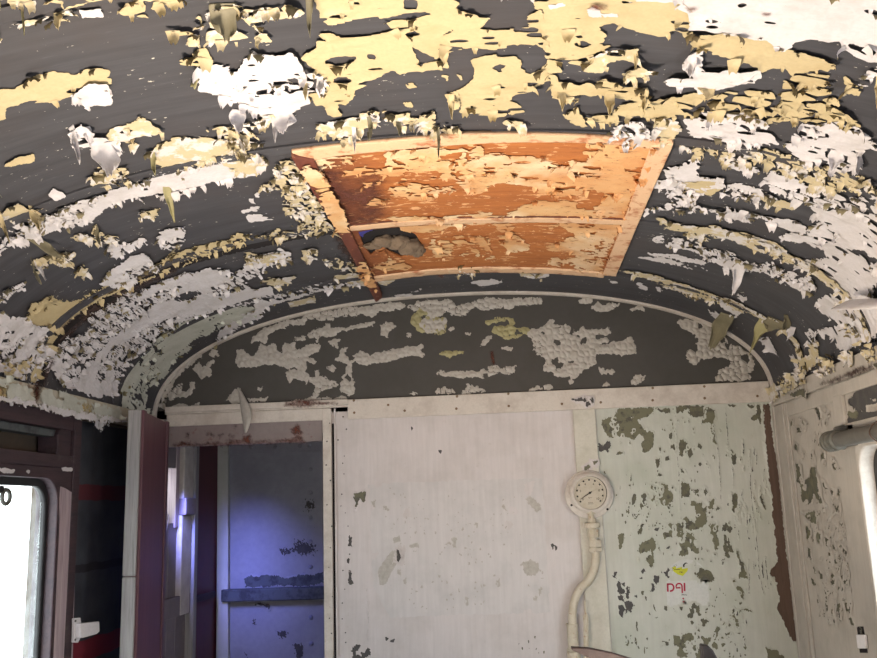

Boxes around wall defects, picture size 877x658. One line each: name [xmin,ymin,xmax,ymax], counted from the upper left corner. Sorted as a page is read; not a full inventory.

peeling [0,0,187,36]
peeling [0,68,113,121]
peeling [860,67,877,103]
peeling [503,120,527,138]
peeling [5,154,35,167]
peeling [388,178,456,201]
peeling [386,212,530,255]
peeling [546,223,622,275]
peeling [235,288,637,401]
peeling [846,385,877,423]
peeling [581,404,754,658]
peeling [789,406,858,628]